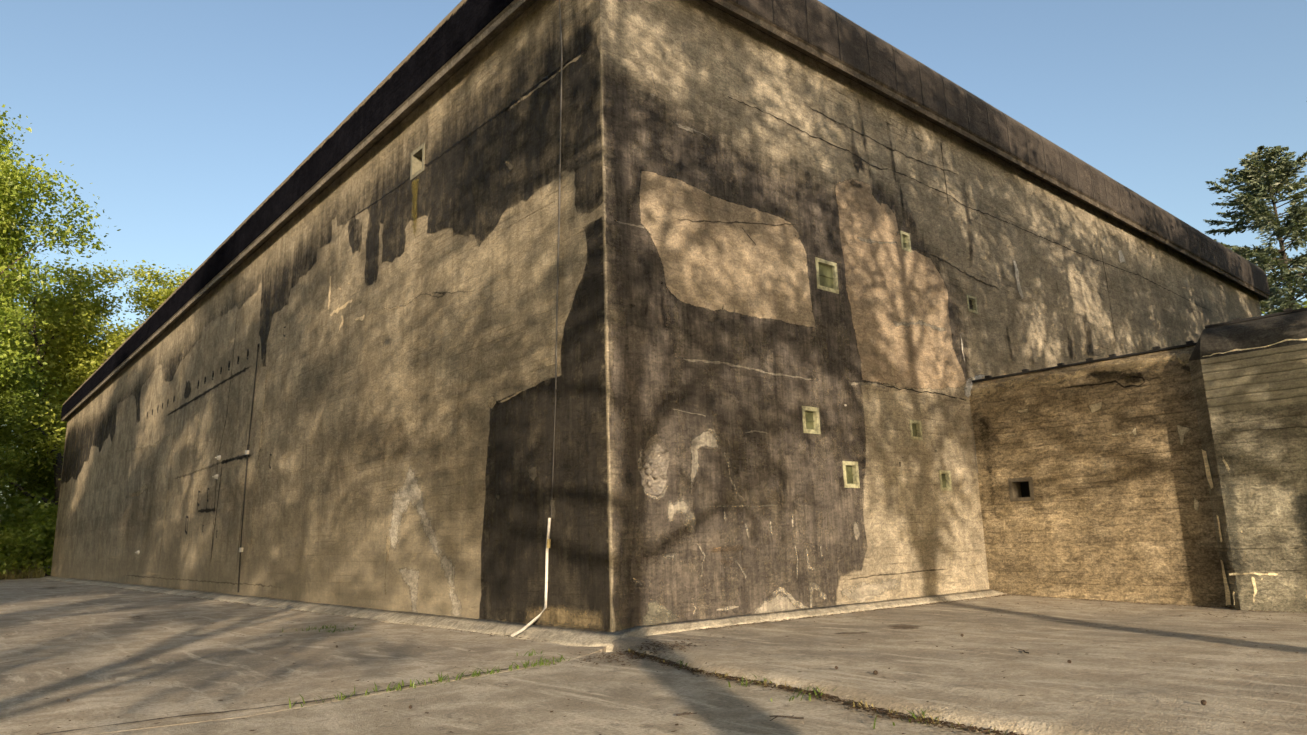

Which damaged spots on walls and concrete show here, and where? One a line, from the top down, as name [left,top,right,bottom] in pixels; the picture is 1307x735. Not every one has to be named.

water stain [852,122,871,176]
water stain [887,122,916,226]
peeling [229,12,1307,632]
peeling [61,324,206,484]
efflorescence [690,429,736,488]
efflorescence [385,466,462,617]
efflorescence [668,500,696,528]
water stain [628,601,676,627]
water stain [754,588,811,614]